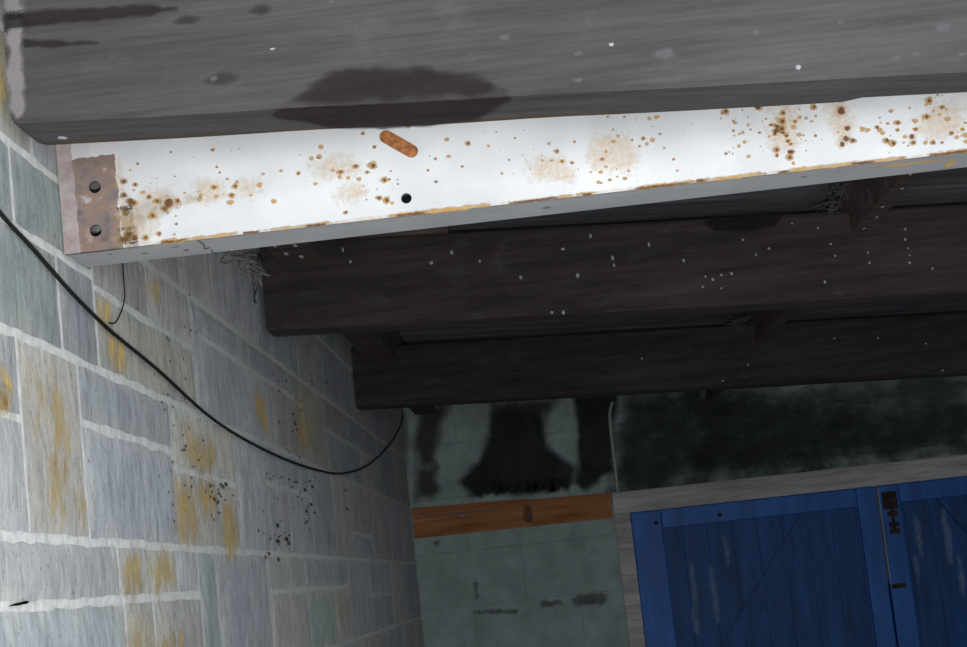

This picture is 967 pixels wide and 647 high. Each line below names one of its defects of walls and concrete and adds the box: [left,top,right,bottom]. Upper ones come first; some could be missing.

corrosion [120,163,329,244]
corrosion [331,161,377,187]
damp [274,69,510,129]
corrosion [372,127,418,158]
corrosion [366,170,490,217]
corrosion [512,116,764,203]
corrosion [720,94,967,173]
damp [402,406,446,496]
damp [461,378,967,497]